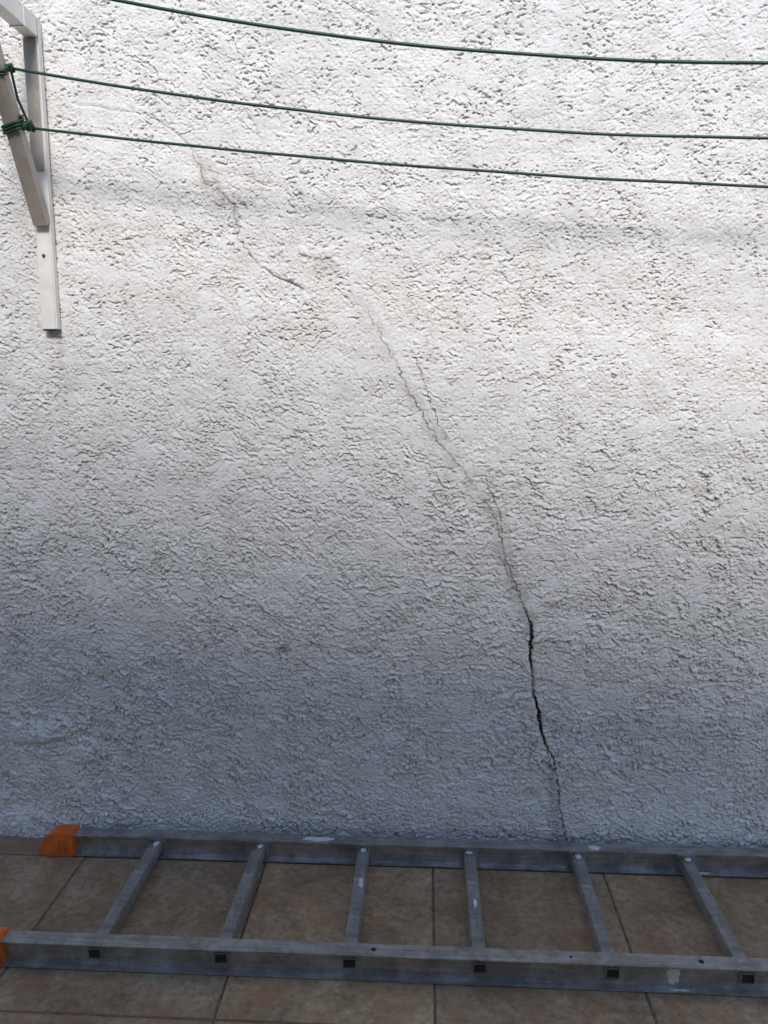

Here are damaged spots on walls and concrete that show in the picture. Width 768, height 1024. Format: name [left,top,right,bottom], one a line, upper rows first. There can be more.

crack [369,316,571,838]